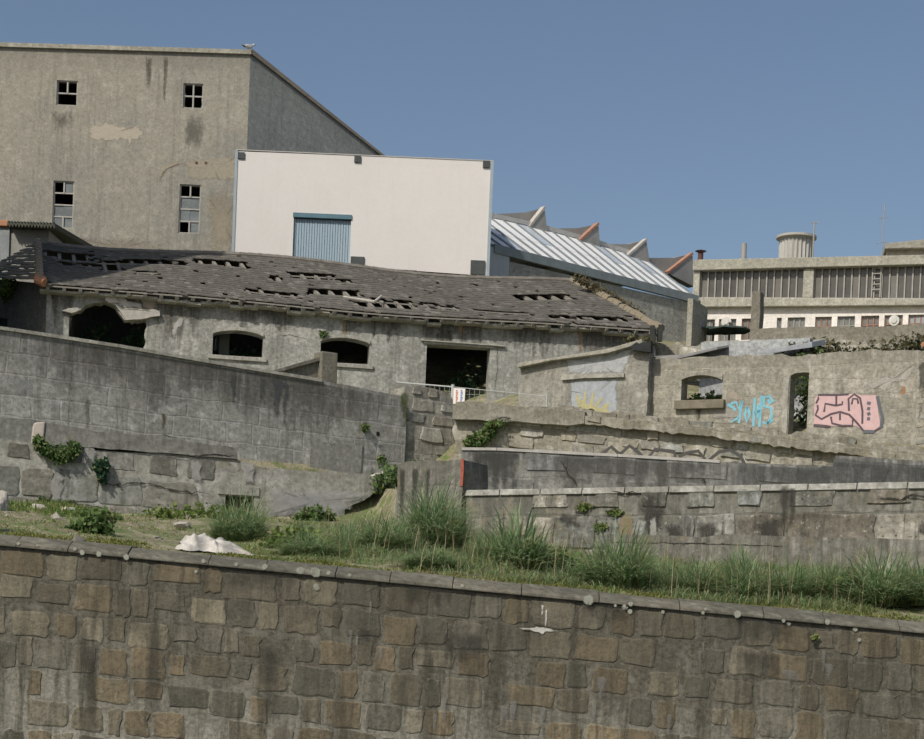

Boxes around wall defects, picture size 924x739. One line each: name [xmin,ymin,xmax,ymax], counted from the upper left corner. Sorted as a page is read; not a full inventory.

water stain [642,499,681,536]
water stain [700,524,715,537]